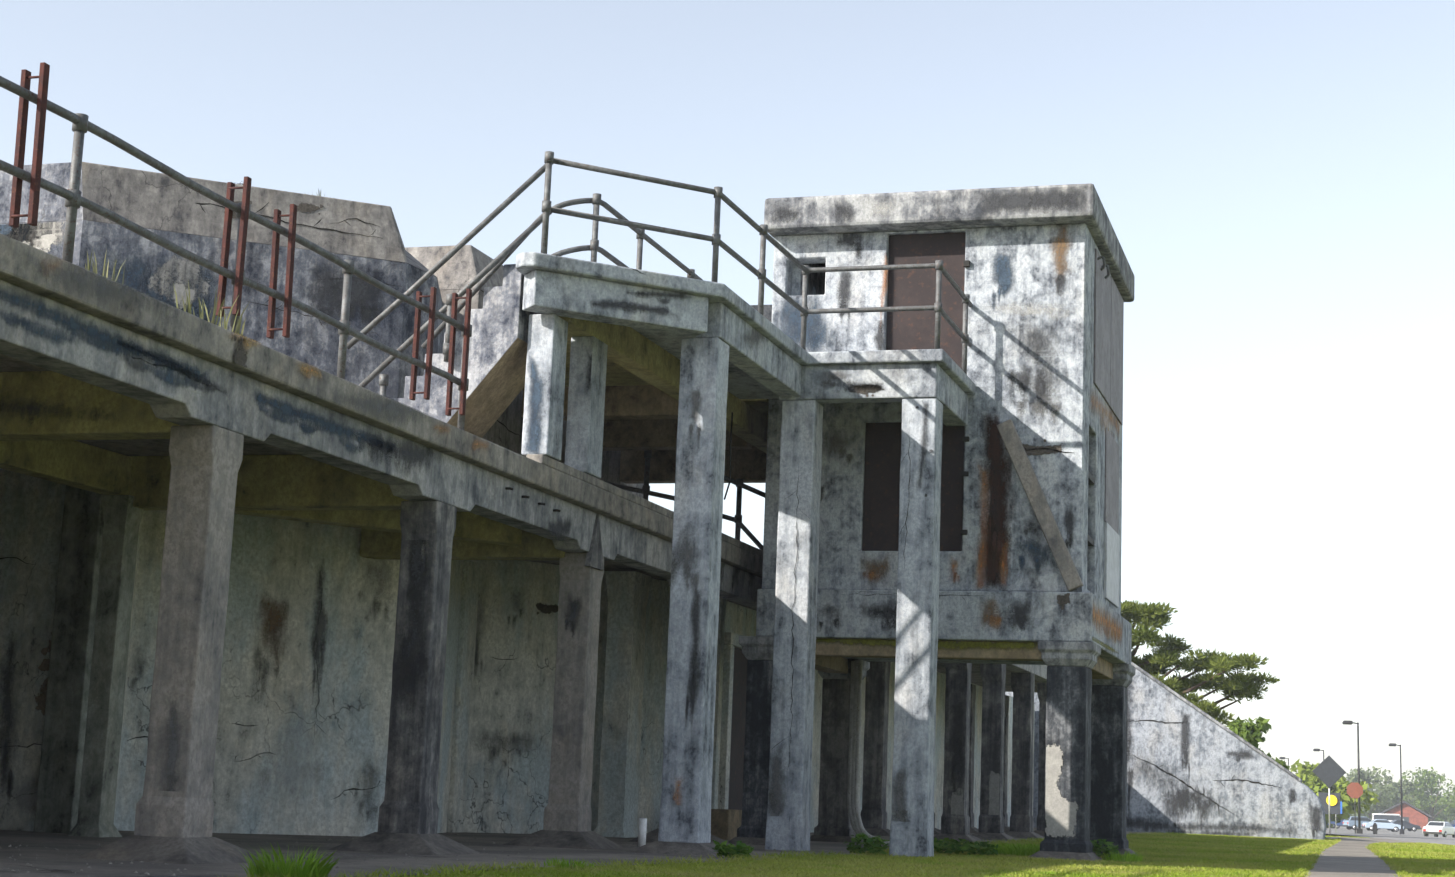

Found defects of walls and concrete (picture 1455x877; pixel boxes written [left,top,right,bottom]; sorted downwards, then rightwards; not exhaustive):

crack [196,202,383,239]
rust [978,415,1013,627]
water stain [256,599,287,670]
water stain [312,566,327,690]
water stain [0,642,15,796]
peeling [1045,743,1079,838]